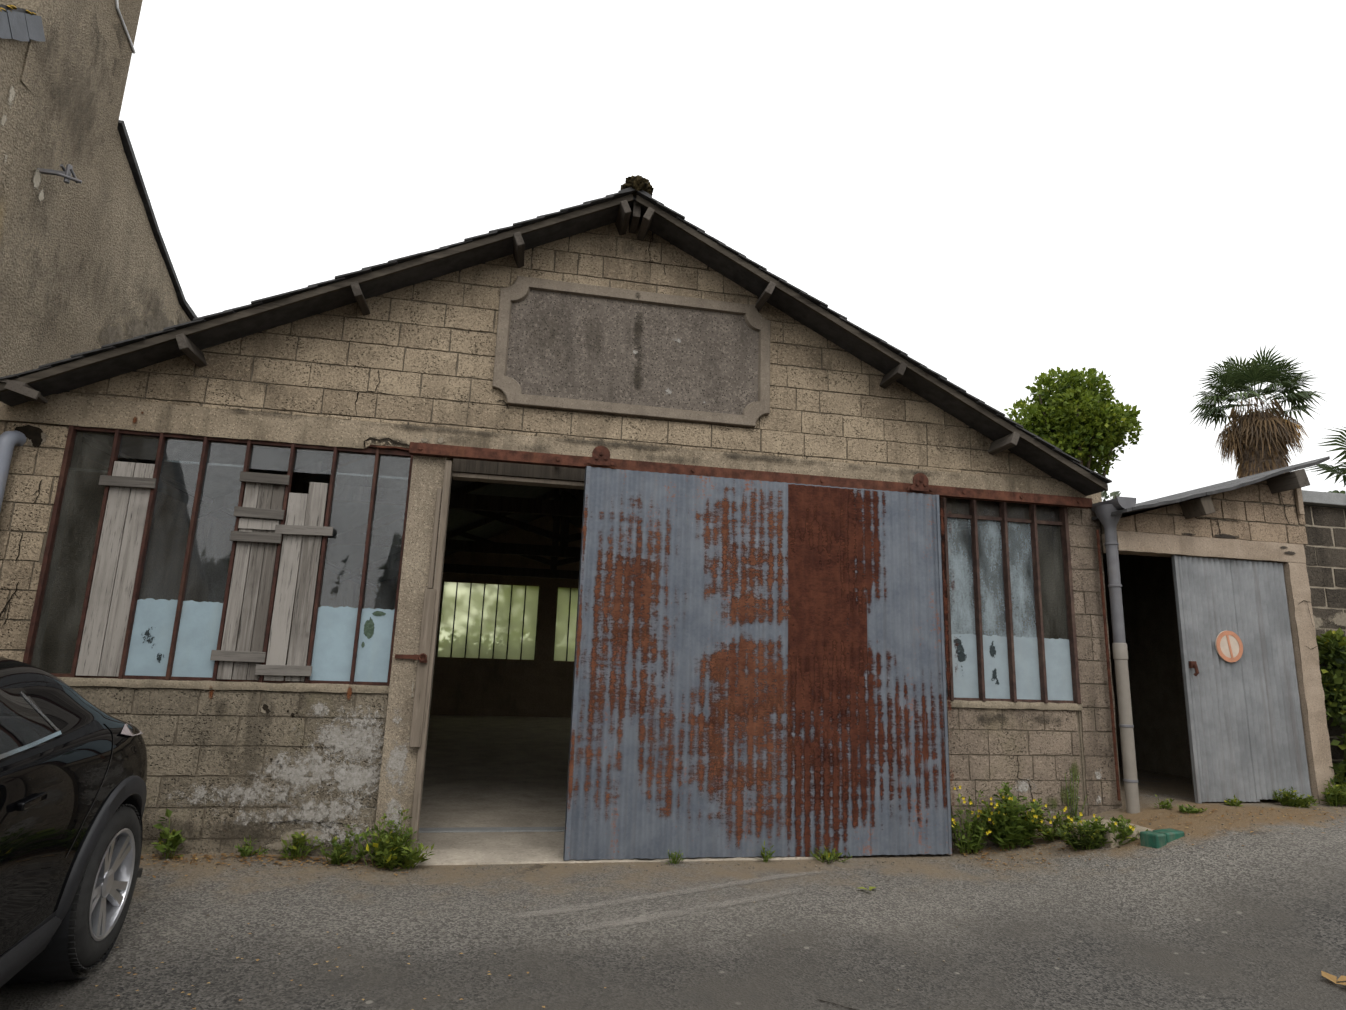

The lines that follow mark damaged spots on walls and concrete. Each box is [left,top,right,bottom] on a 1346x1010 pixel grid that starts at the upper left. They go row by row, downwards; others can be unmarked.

peeling [168,702,409,850]
corrosion [568,484,958,857]